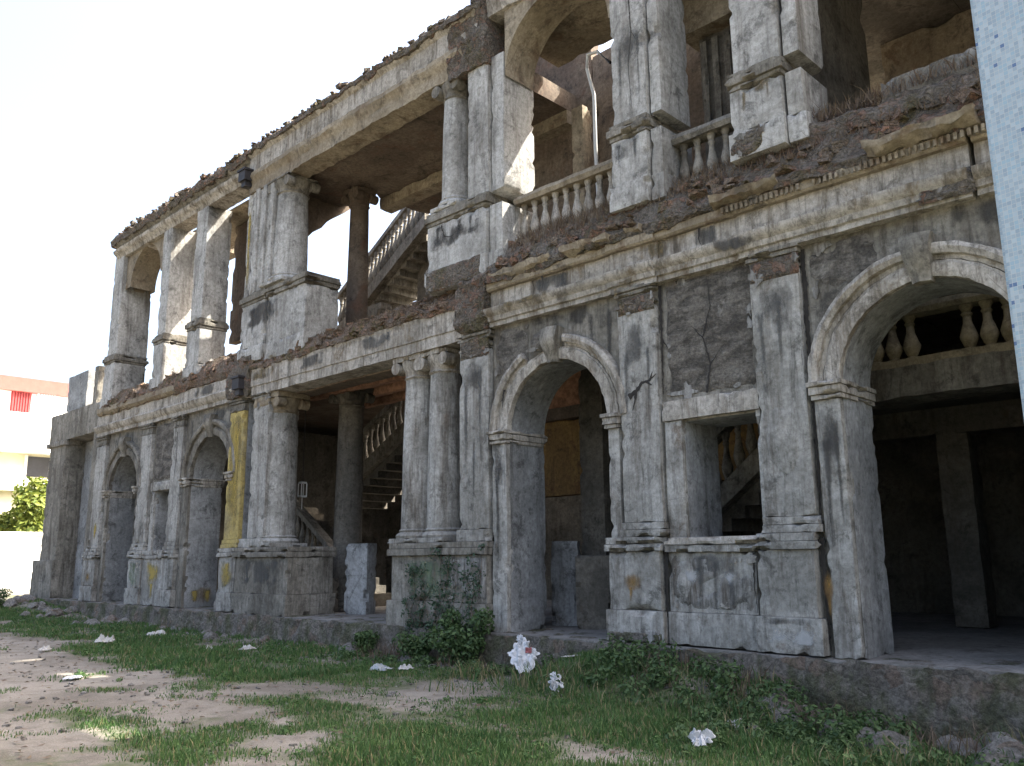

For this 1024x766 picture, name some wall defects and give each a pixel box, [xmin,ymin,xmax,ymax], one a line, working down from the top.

water stain [434,215,476,248]
water stain [248,300,274,329]
crack [628,285,668,408]
crack [691,283,719,393]
water stain [823,416,843,542]
water stain [685,555,734,599]